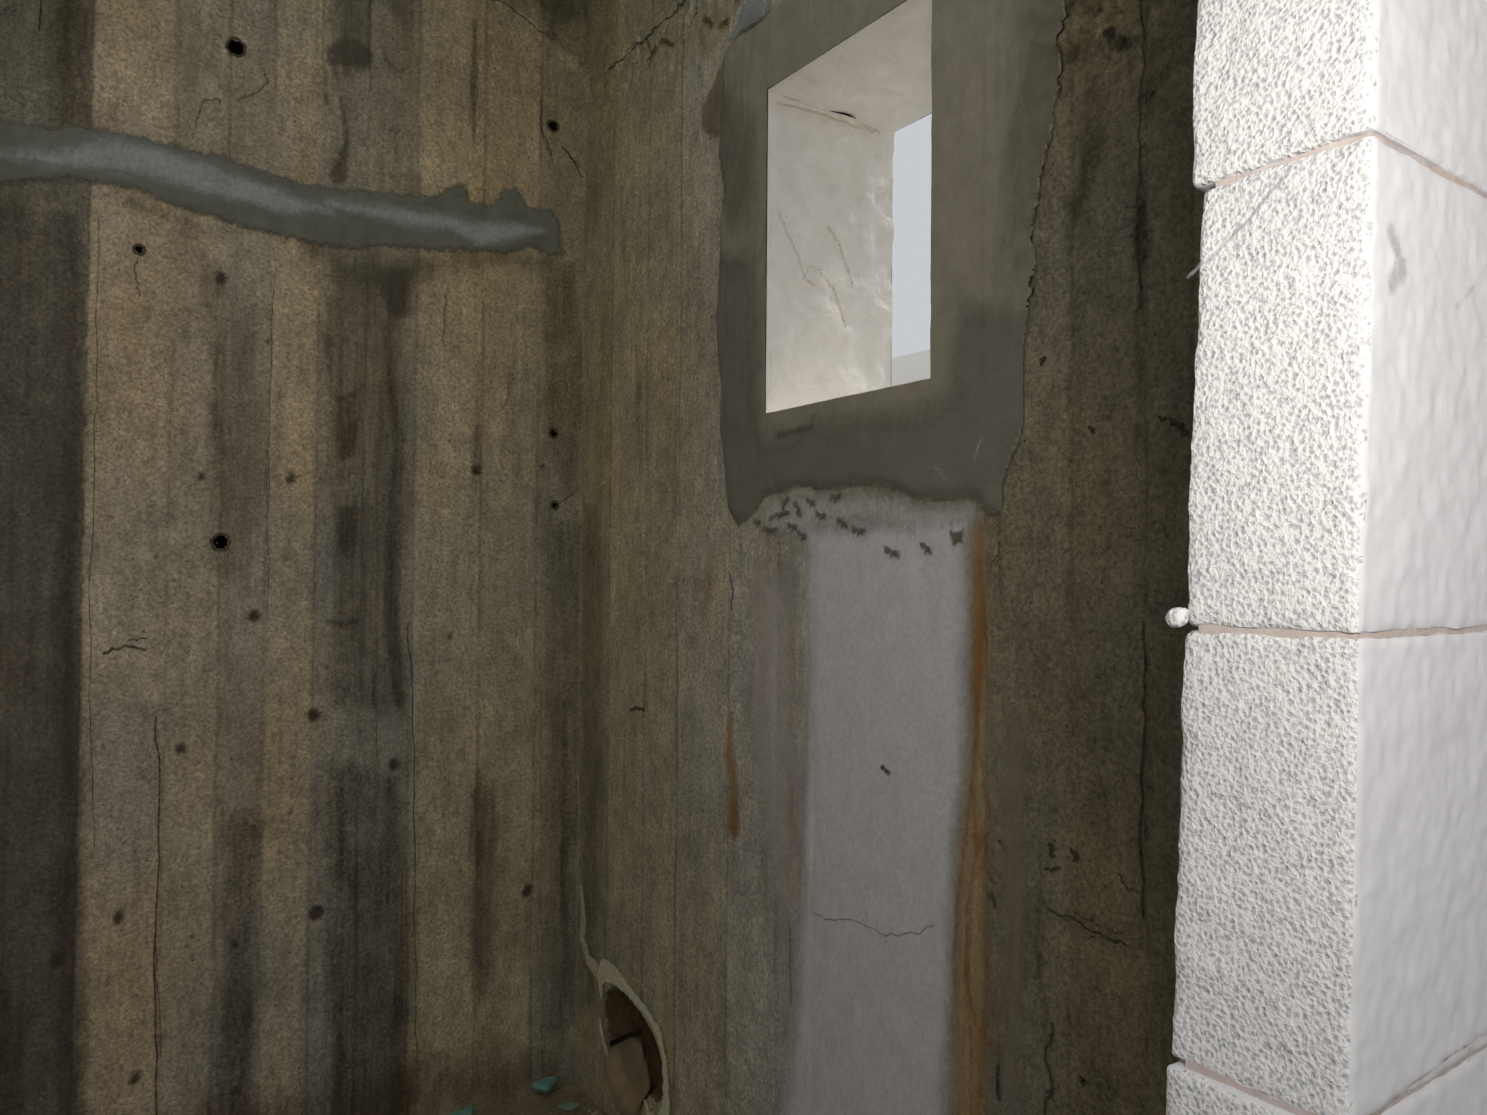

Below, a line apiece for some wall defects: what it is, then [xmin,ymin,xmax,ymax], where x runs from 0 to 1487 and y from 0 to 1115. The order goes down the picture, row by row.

crack [607,0,698,71]
damp [335,260,433,704]
damp [716,257,1027,526]
damp [753,518,968,1115]
crack [1138,621,1154,919]